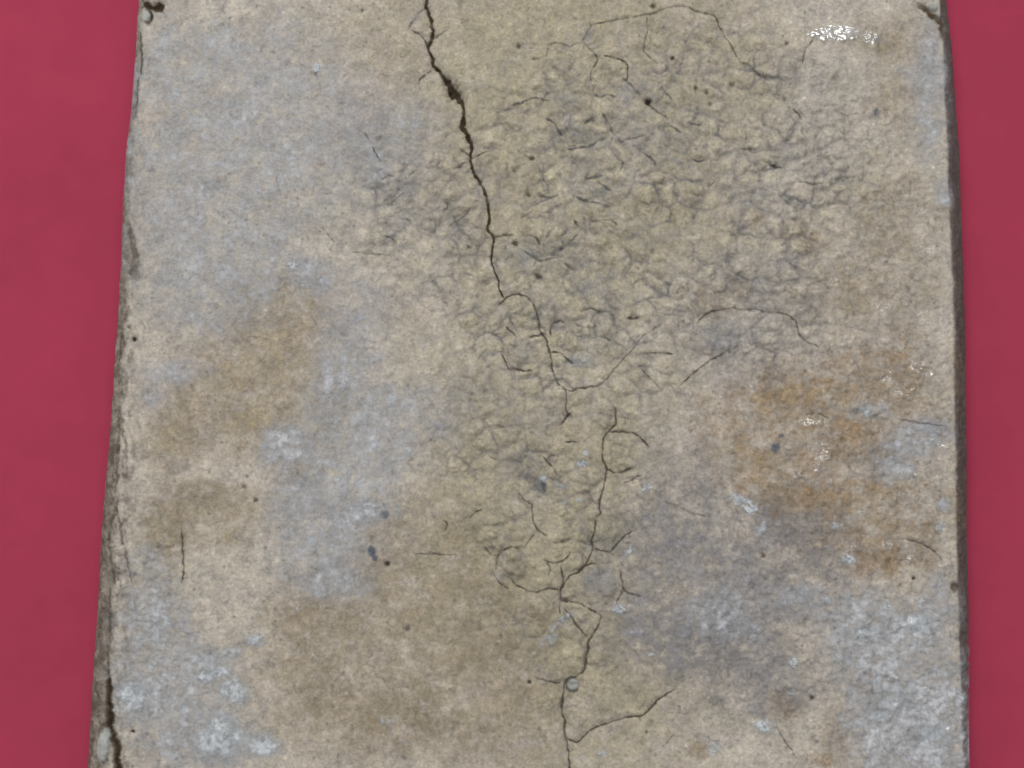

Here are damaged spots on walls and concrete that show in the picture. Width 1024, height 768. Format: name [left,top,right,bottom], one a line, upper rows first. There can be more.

crack [409,0,700,443]
crack [699,308,817,346]
crack [486,410,674,768]